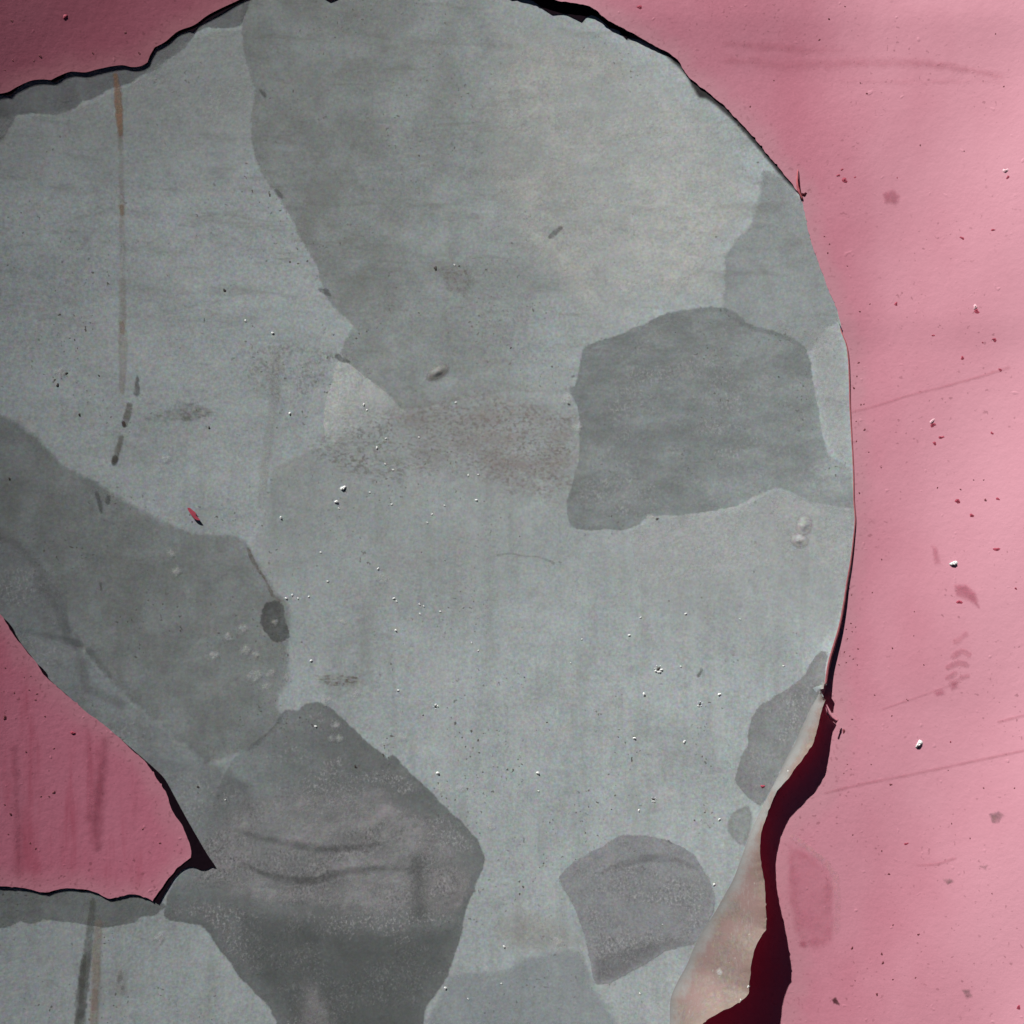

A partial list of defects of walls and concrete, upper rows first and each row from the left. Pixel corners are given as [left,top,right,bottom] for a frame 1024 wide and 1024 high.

corrosion [114,74,122,135]
peeling [0,0,238,94]
water stain [261,601,289,642]
peeling [0,615,191,901]
water stain [736,651,827,804]
water stain [0,714,484,1024]
water stain [559,835,715,984]